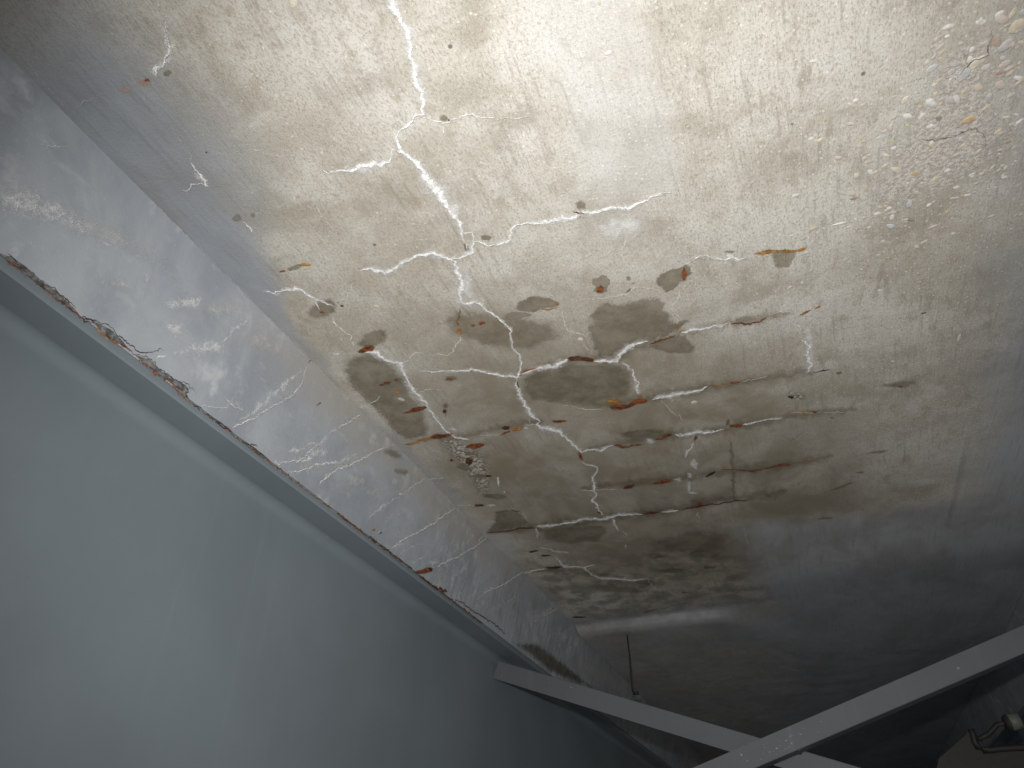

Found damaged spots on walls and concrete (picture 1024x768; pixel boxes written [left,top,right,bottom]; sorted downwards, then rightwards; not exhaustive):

crack [172,128,233,192]
spalling [0,253,507,633]
leakage [343,329,430,442]
corrosion [404,417,566,466]
leakage [437,296,562,351]
crack [252,0,855,598]
leakage [523,265,695,402]
corrosion [753,246,807,269]